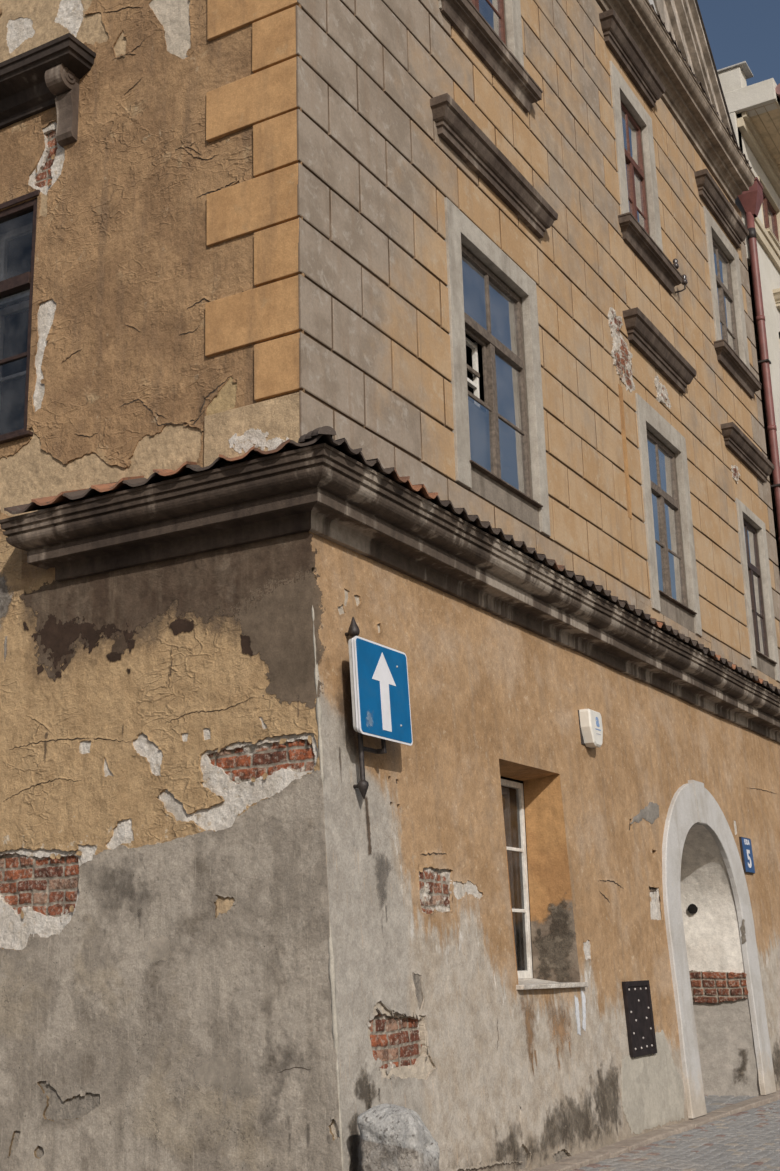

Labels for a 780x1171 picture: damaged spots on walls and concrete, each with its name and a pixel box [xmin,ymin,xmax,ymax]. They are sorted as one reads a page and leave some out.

flaking render [149,0,194,59]
flaking render [35,131,58,217]
flaking render [607,307,635,393]
crack [119,376,230,426]
flaking render [0,846,82,919]
flaking render [418,864,454,916]
water stain [533,899,576,982]
flaking render [689,970,748,1004]
flaking render [367,973,434,1082]
spalling [39,1079,100,1125]
water stain [497,1069,621,1169]